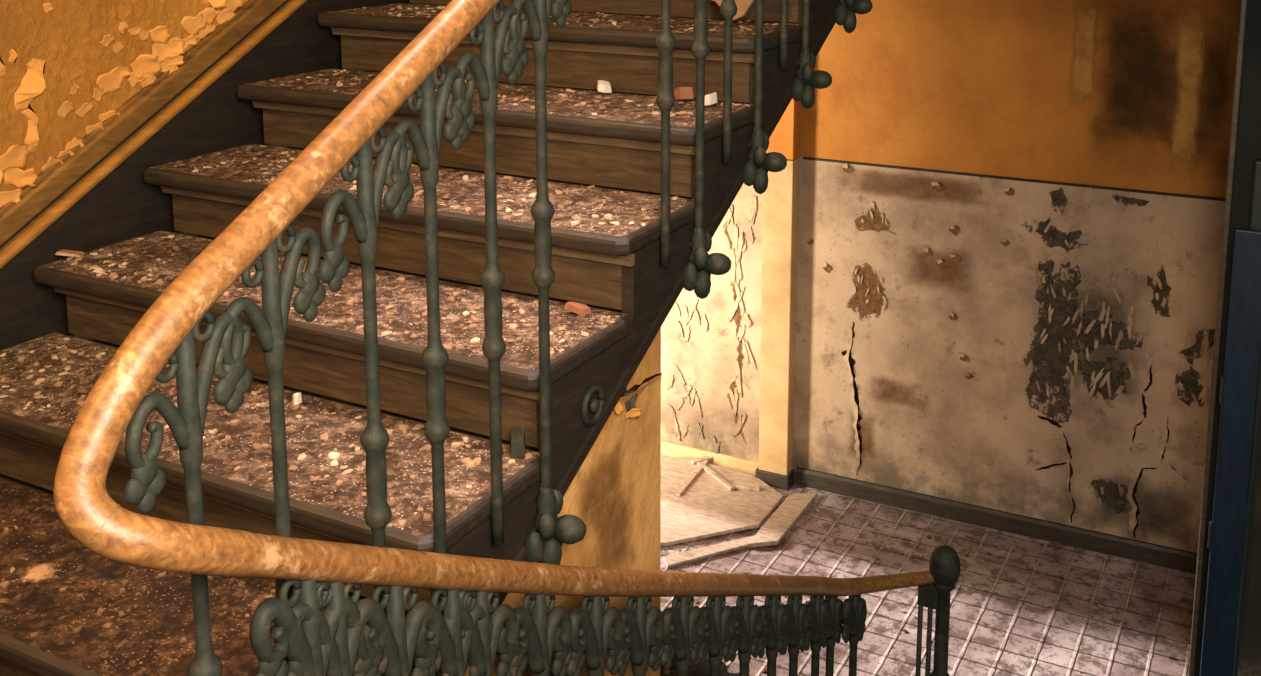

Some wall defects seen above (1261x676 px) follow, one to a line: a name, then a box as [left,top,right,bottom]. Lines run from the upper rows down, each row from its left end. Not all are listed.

peeling [0,0,244,207]
damp [1113,22,1225,161]
flaking render [854,201,896,235]
flaking render [847,263,887,321]
flaking render [1024,187,1215,423]
crack [841,321,862,475]
crack [1036,416,1075,523]
flaking render [1091,479,1134,514]
crack [1127,354,1194,540]